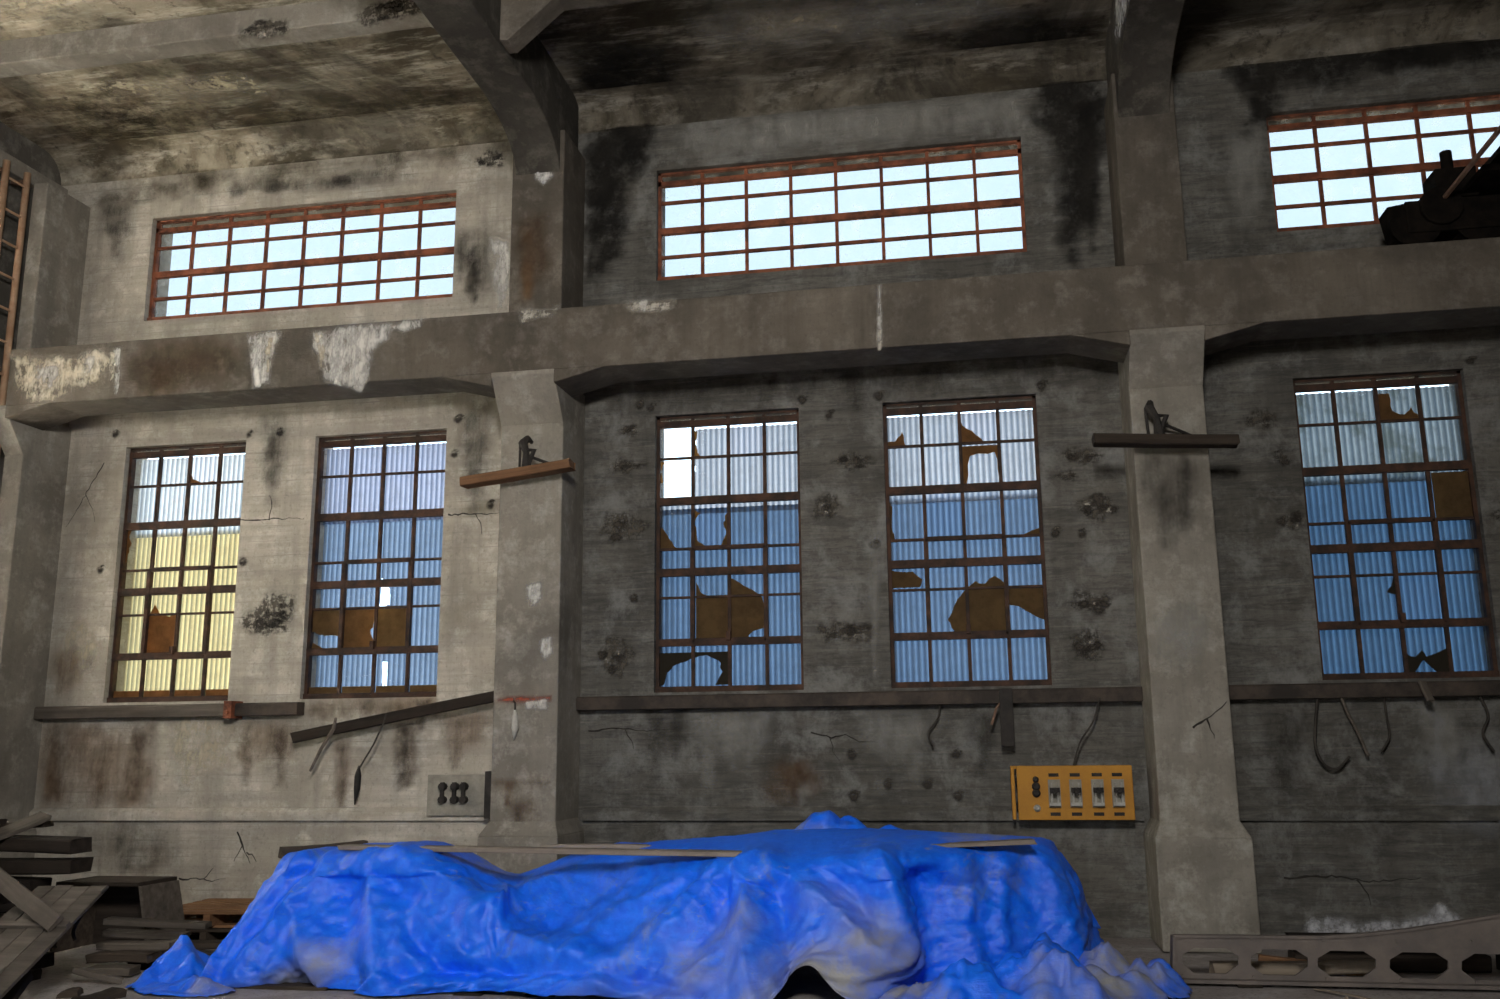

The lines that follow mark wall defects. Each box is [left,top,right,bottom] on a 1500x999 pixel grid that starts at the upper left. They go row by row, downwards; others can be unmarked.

water stain [977,25,1037,48]
water stain [468,241,510,300]
peeling [11,350,109,401]
spalling [1079,493,1117,538]